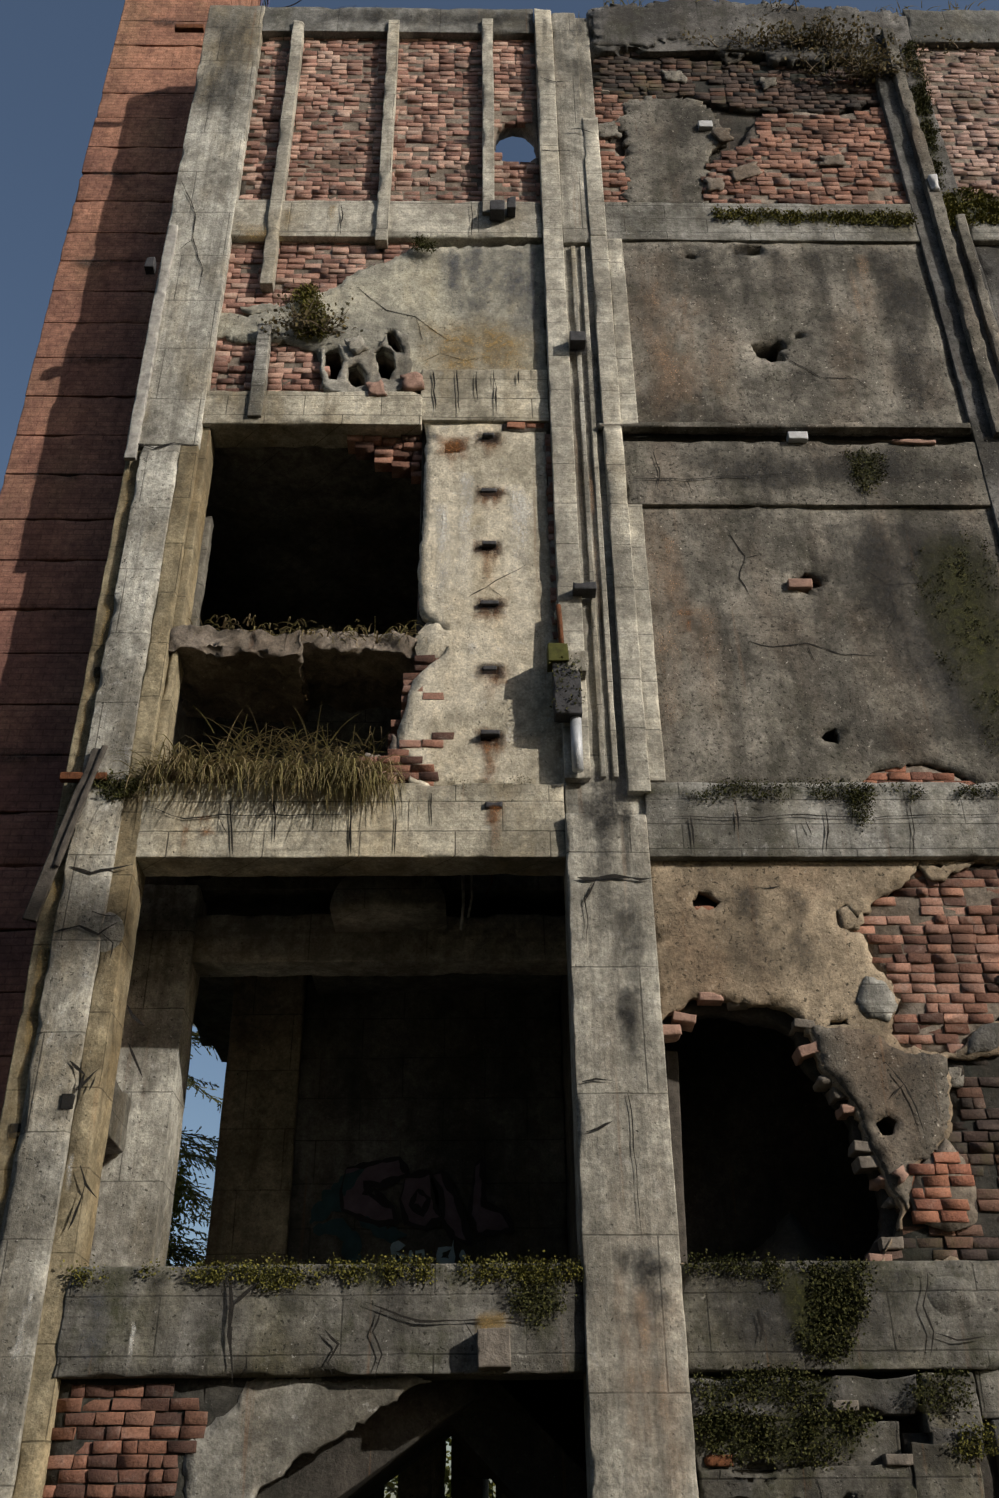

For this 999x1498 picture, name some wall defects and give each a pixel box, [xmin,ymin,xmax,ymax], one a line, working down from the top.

spalling [592,52,908,205]
spalling [221,241,418,317]
spalling [210,327,425,397]
crack [729,533,760,594]
crack [746,567,960,665]
spalling [356,735,439,786]
spalling [693,896,718,910]
spalling [663,992,748,1043]
spalling [789,1018,820,1066]
spalling [836,861,999,1261]
crack [227,1272,261,1379]
crack [324,1301,544,1379]